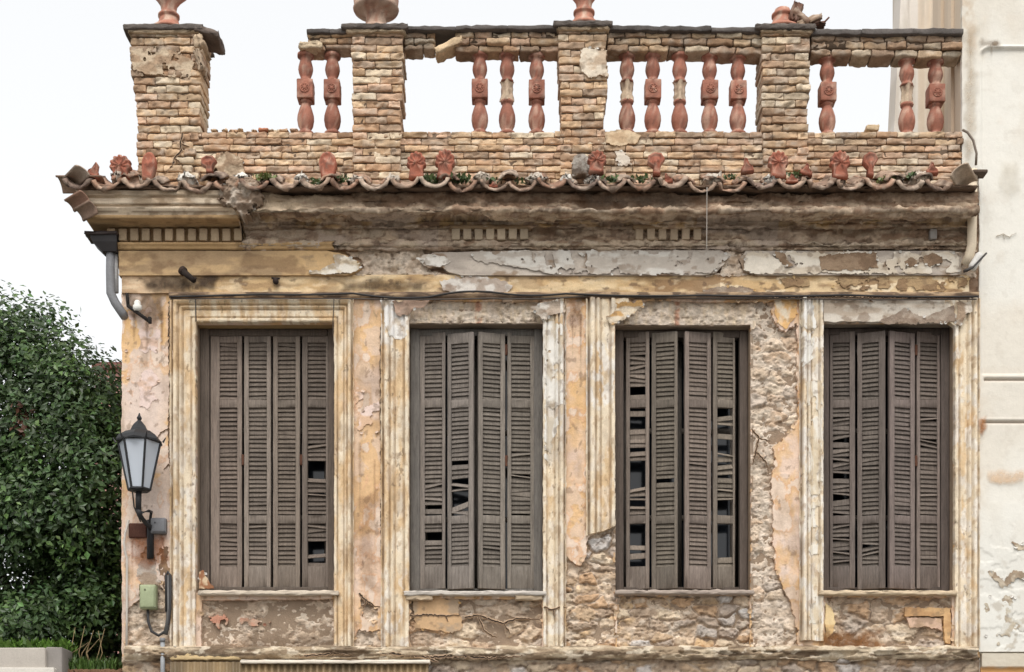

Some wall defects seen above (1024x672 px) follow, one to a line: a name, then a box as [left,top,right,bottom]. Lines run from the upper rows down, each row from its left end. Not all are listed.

leakage [586,194,688,207]
flaking render [308,249,977,648]
crack [751,428,770,475]
flaking render [198,570,334,647]
crack [379,606,566,663]
peeling [984,570,1024,646]